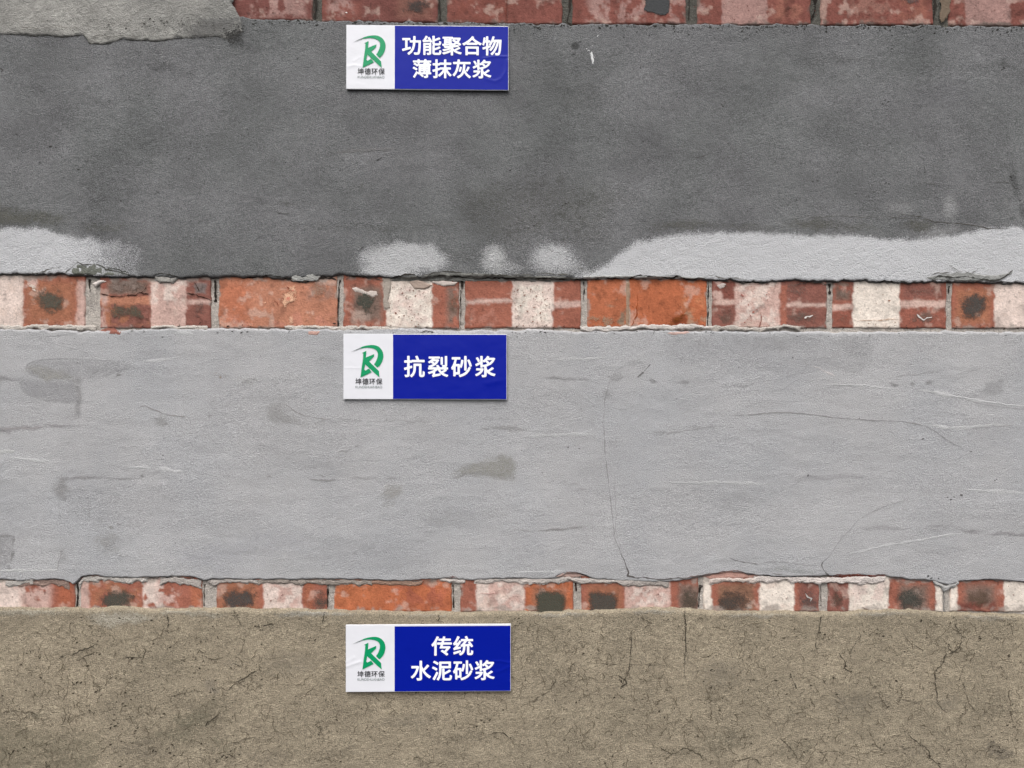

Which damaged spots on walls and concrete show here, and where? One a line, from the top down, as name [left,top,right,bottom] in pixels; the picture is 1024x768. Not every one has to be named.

crack [603,381,1024,588]
crack [0,607,1024,768]